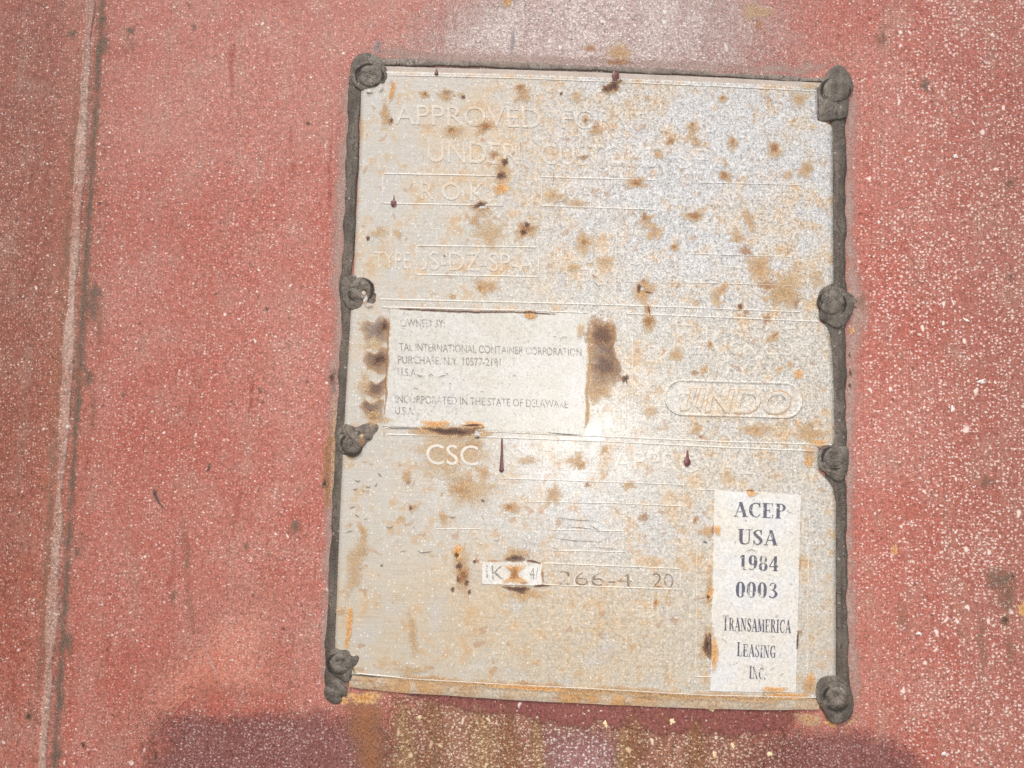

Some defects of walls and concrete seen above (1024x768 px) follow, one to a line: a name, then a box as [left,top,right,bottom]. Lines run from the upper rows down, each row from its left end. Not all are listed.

corrosion [602,79,624,94]
corrosion [446,121,492,136]
corrosion [490,152,509,195]
corrosion [720,136,739,182]
corrosion [468,200,537,243]
corrosion [639,211,664,239]
corrosion [731,211,822,342]
corrosion [399,294,555,320]
corrosion [633,279,657,331]
corrosion [411,421,492,503]
corrosion [450,545,478,594]
corrosion [491,548,551,601]